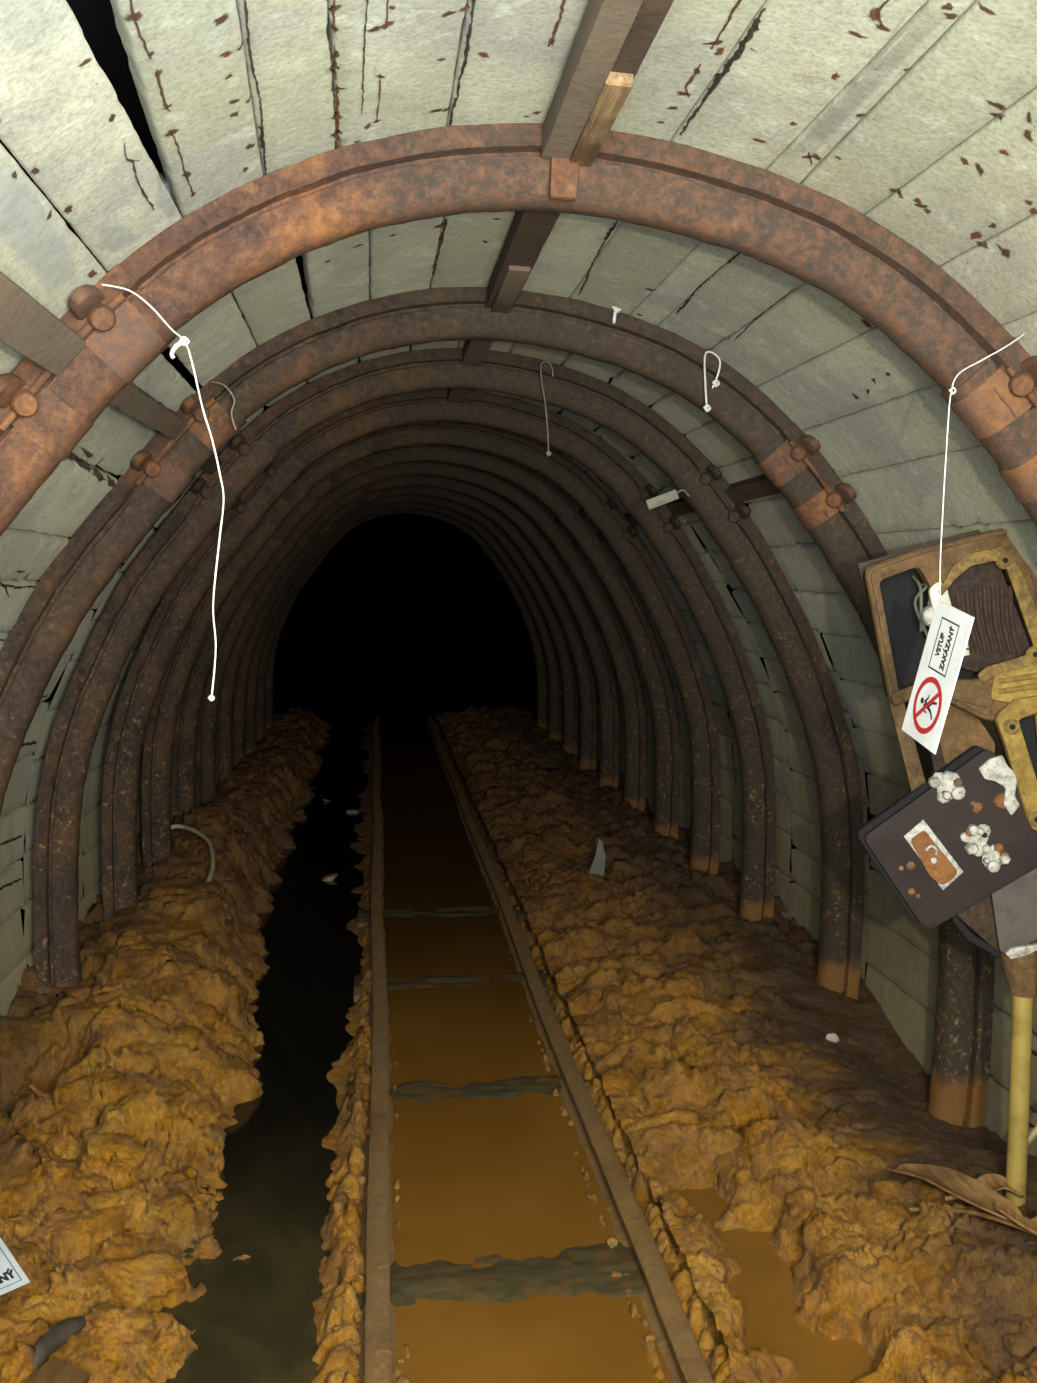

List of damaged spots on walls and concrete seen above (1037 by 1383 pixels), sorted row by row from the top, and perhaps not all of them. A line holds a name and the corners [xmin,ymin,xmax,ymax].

rust [367,0,395,32]
rust [849,0,890,38]
rust [125,0,172,112]
rust [329,0,385,149]
crack [361,0,369,114]
crack [680,8,766,136]
rust [988,101,1006,120]
crack [124,143,154,210]
rust [165,129,196,196]
rust [971,223,1010,258]
crack [0,570,36,598]
crack [0,878,22,890]